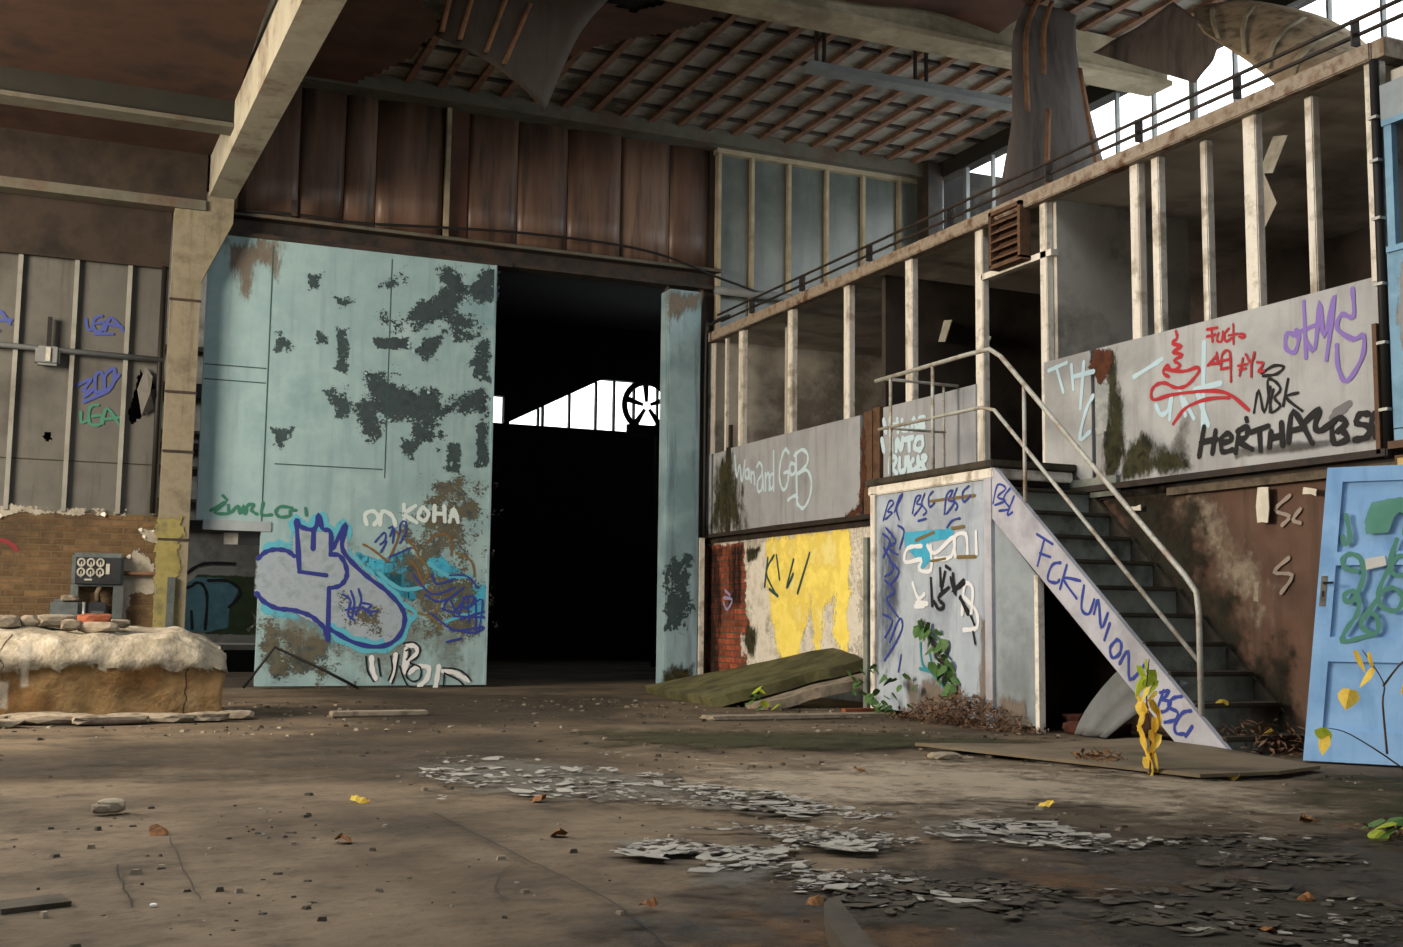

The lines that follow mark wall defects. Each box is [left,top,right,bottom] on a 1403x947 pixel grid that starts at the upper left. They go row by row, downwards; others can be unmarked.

rust [230,239,280,298]
peeling [308,271,325,291]
peeling [273,331,296,353]
peeling [270,426,295,450]
peeling [314,264,504,645]
leakage [1235,441,1327,458]
spalling [0,503,127,519]
peeling [120,515,186,627]
peeling [662,527,867,673]
leakage [1188,499,1256,597]
peeling [249,587,400,688]